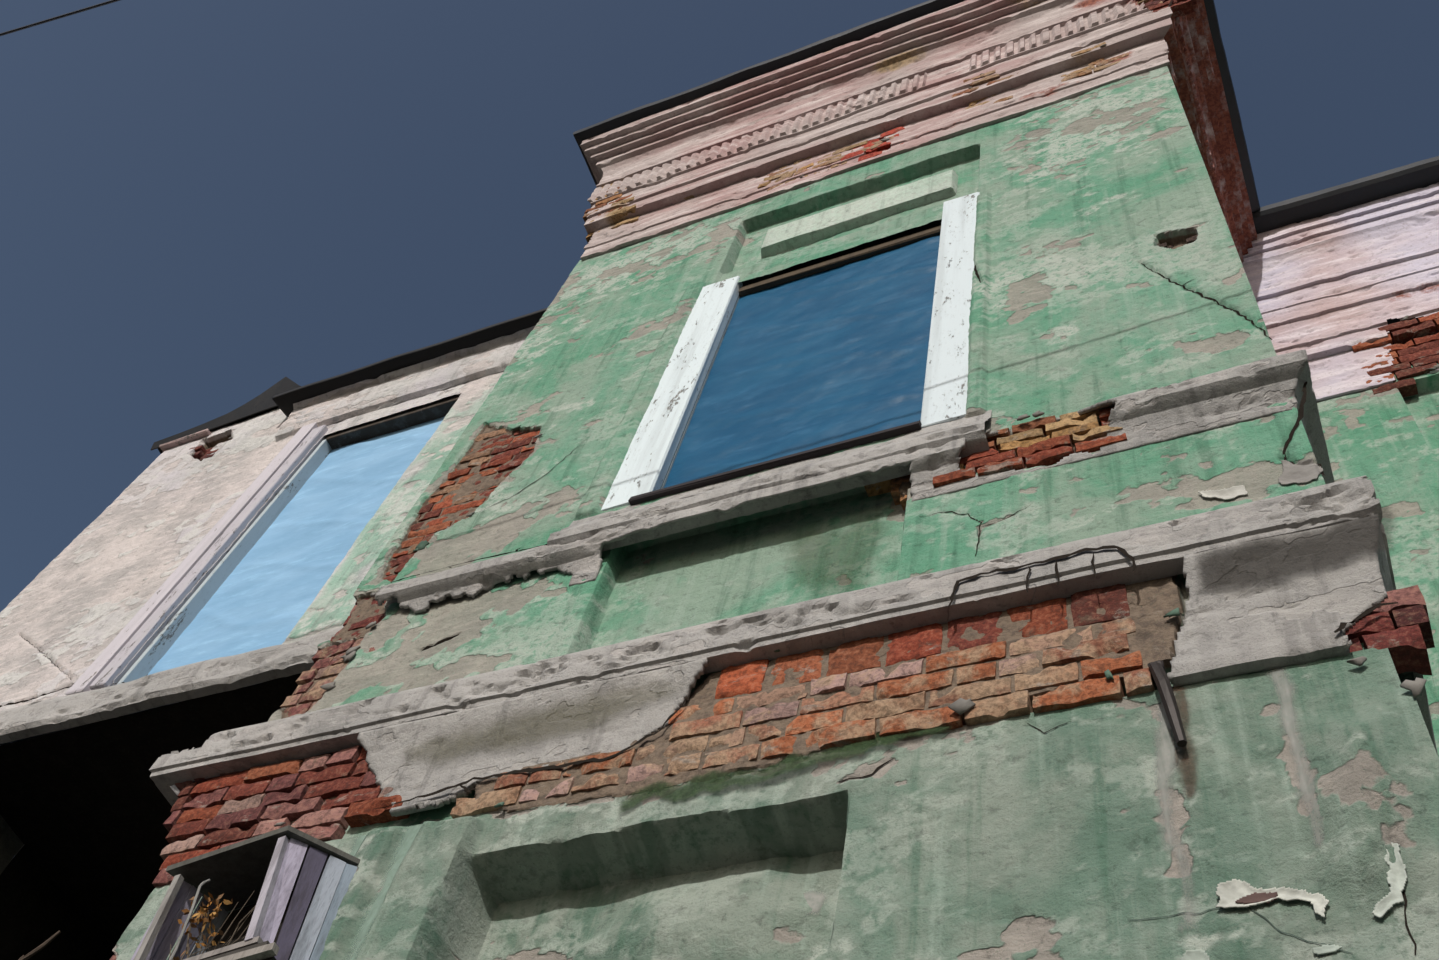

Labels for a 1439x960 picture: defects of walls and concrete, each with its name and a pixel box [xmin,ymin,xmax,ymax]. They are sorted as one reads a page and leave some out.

flaking render [1135,0,1198,18]
flaking render [757,125,906,191]
crack [1141,263,1272,340]
flaking render [1352,312,1439,397]
flaking render [933,407,1127,488]
crack [1282,381,1325,476]
flaking render [384,425,543,582]
crack [927,504,1136,606]
flaking render [280,598,387,717]
flaking render [450,584,1156,819]
flaking render [1346,585,1439,698]
flaking render [152,745,410,888]